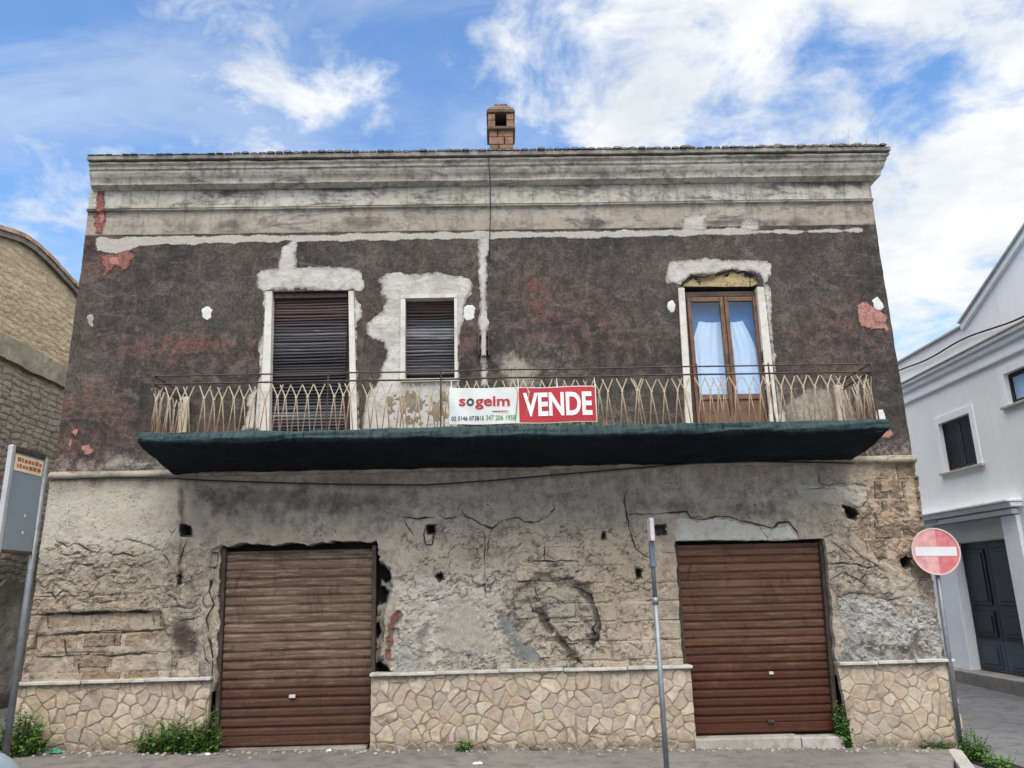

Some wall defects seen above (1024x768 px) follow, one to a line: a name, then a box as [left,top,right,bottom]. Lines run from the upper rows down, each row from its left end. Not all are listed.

peeling [93,191,107,234]
peeling [101,251,134,280]
spalling [681,272,757,288]
peeling [857,302,889,331]
crack [624,490,799,558]
crack [804,471,869,509]
crack [34,527,222,681]
spalling [376,562,403,672]
crack [403,504,601,664]
crack [823,536,907,608]